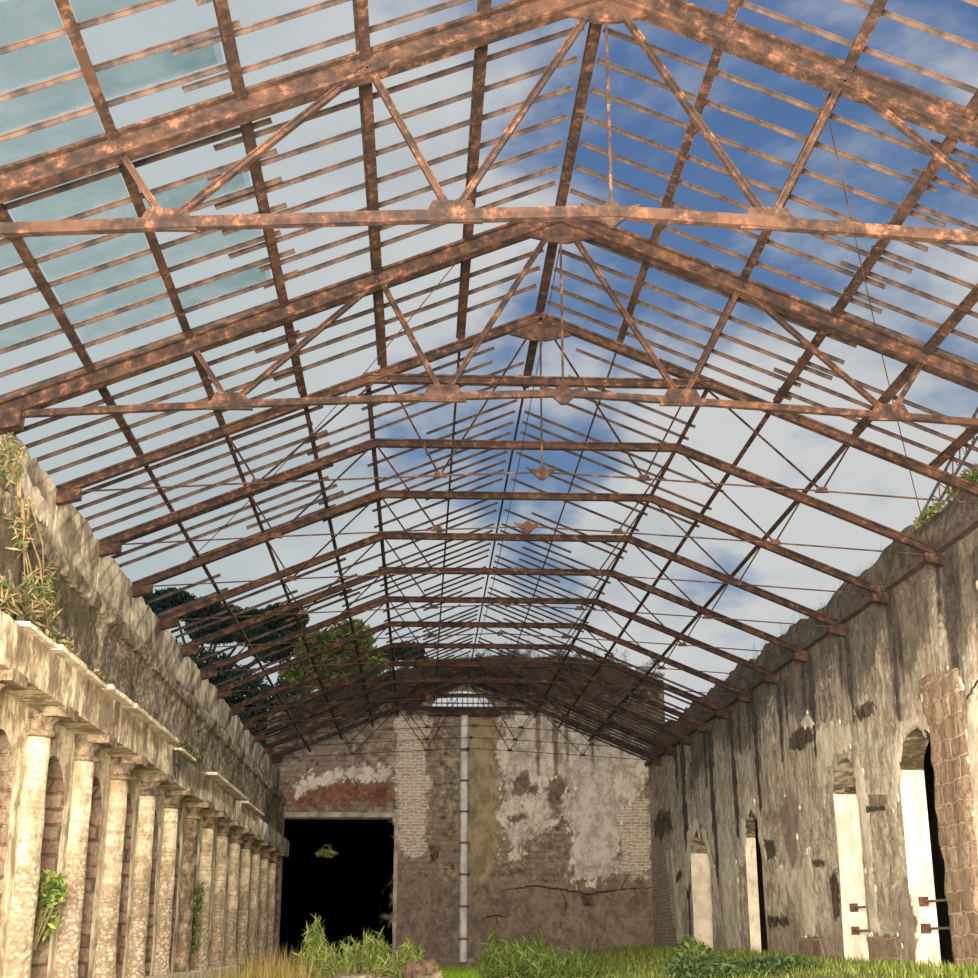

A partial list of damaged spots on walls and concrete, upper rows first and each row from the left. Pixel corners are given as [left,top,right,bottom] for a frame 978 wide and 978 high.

flaking render [390,712,438,859]
leakage [674,496,978,885]
flaking render [917,666,978,967]